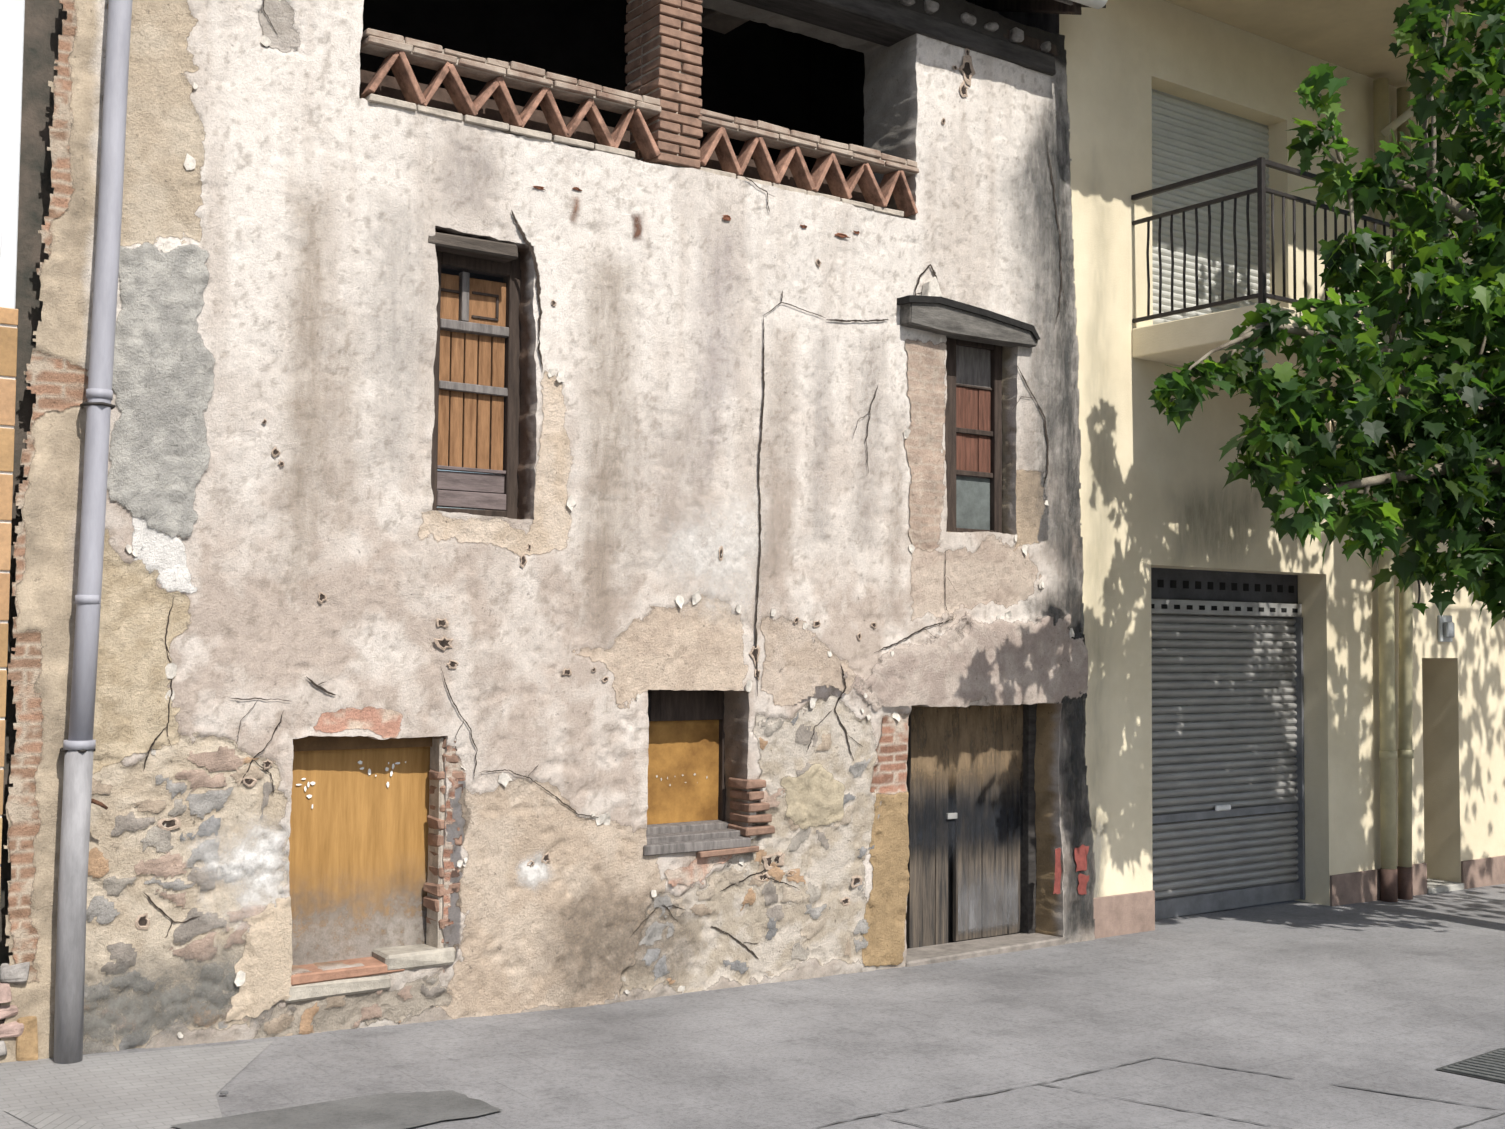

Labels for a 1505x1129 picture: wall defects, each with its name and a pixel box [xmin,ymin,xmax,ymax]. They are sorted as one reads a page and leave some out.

flaking render [37,0,78,280]
crack [755,291,888,696]
crack [915,264,937,295]
peeling [903,338,1049,621]
water stain [1033,77,1085,645]
flaking render [0,351,89,1061]
crack [440,666,598,818]
peeling [435,745,797,1020]
peeling [562,590,856,709]
crack [806,551,957,761]
peeling [861,704,1023,795]
water stain [1059,691,1095,929]